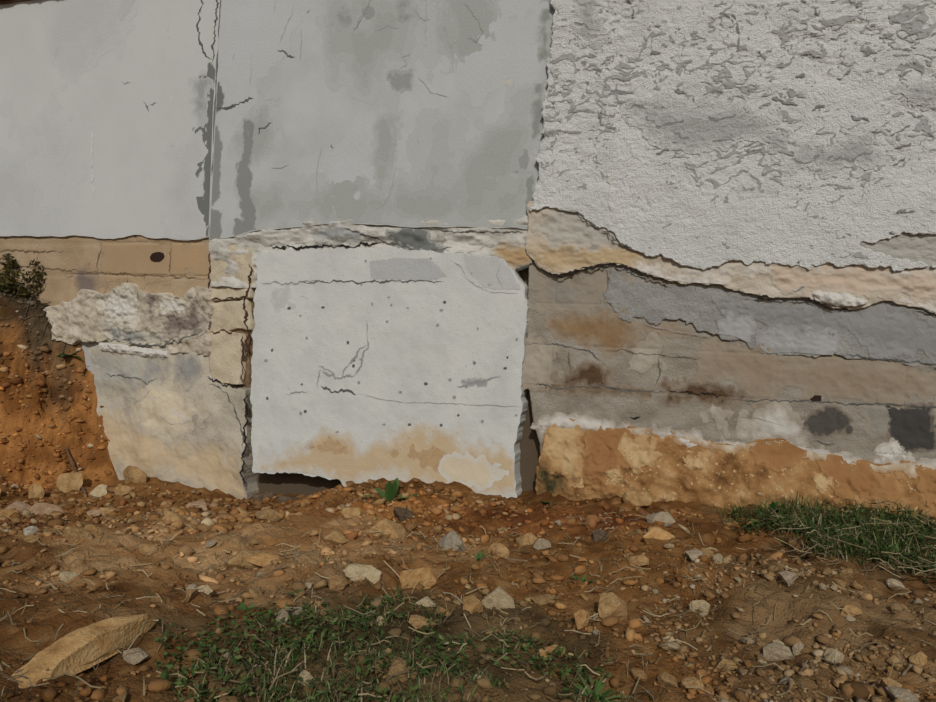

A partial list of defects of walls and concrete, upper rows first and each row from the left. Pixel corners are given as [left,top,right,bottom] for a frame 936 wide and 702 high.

crack [196,0,274,110]
damp [72,0,553,399]
spalling [531,208,632,253]
spalling [860,233,936,269]
crack [748,295,853,311]
crack [0,228,521,487]
spalling [515,337,558,392]
crack [526,343,936,425]
spalling [541,418,586,487]
damp [537,457,591,501]
spalling [604,432,662,486]
damp [529,359,936,479]